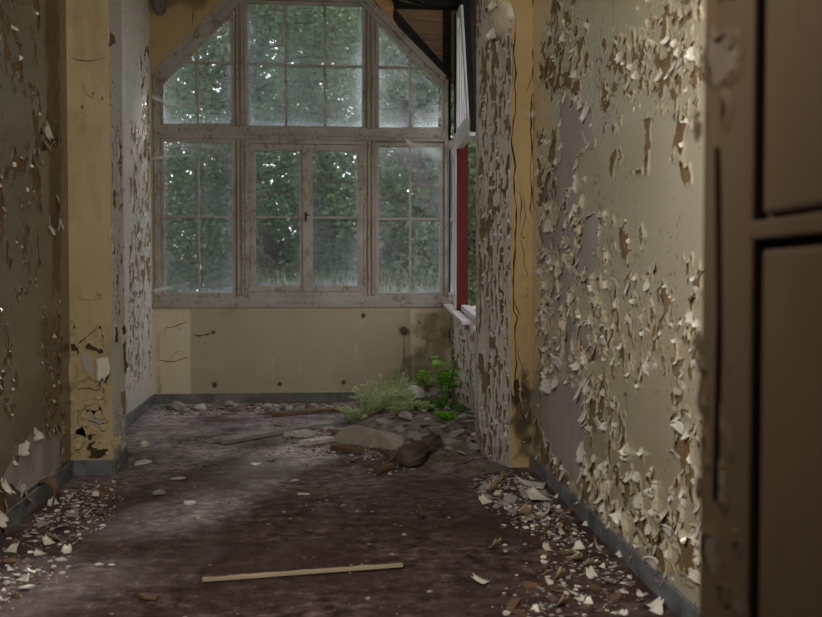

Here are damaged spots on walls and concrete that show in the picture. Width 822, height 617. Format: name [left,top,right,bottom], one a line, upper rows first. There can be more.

flaking render [374,0,397,25]
peeling [0,0,65,421]
peeling [3,484,113,567]
flaking render [0,404,120,535]
peeling [80,351,110,382]
peeling [108,35,152,384]
crack [160,321,211,362]
peeling [451,0,523,463]
crack [510,33,533,409]
flaking render [513,0,749,617]